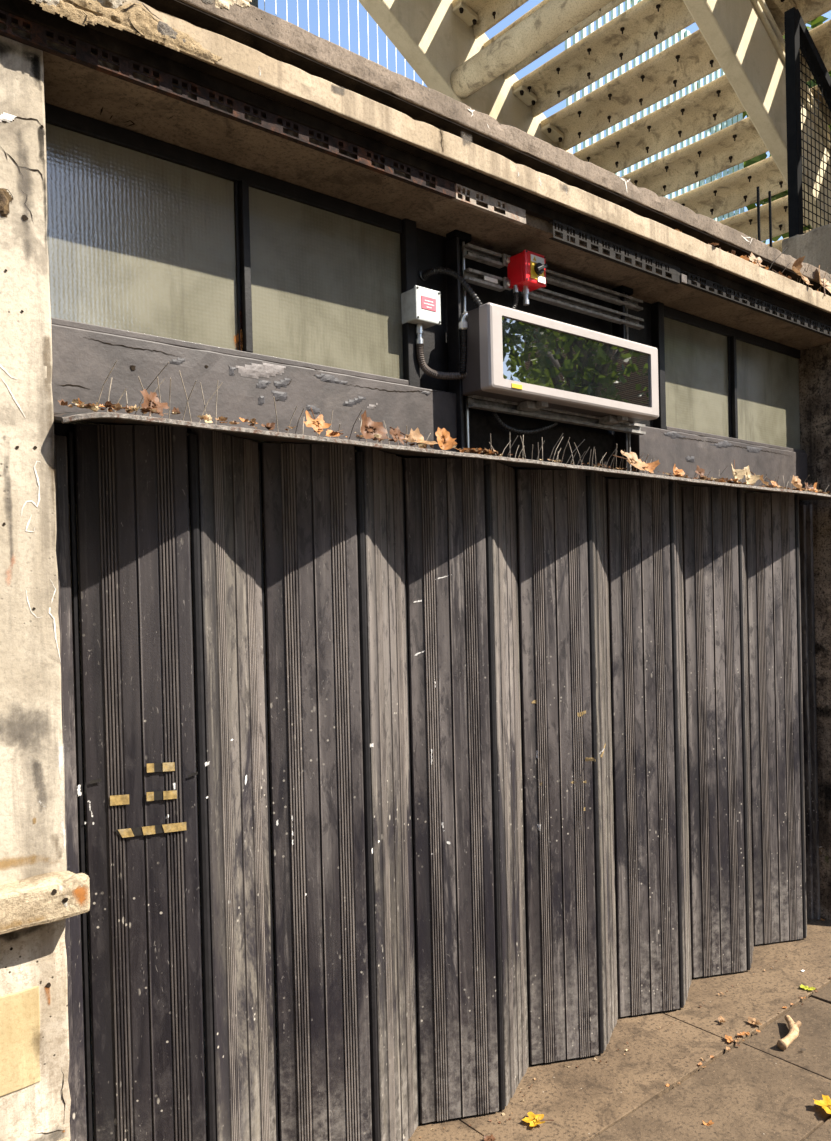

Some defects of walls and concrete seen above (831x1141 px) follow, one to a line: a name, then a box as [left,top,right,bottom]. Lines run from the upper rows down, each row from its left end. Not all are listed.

peeling [202,0,252,9]
spalling [31,0,222,64]
damp [5,471,13,556]
damp [0,710,48,746]
damp [34,762,46,805]
damp [0,856,35,868]